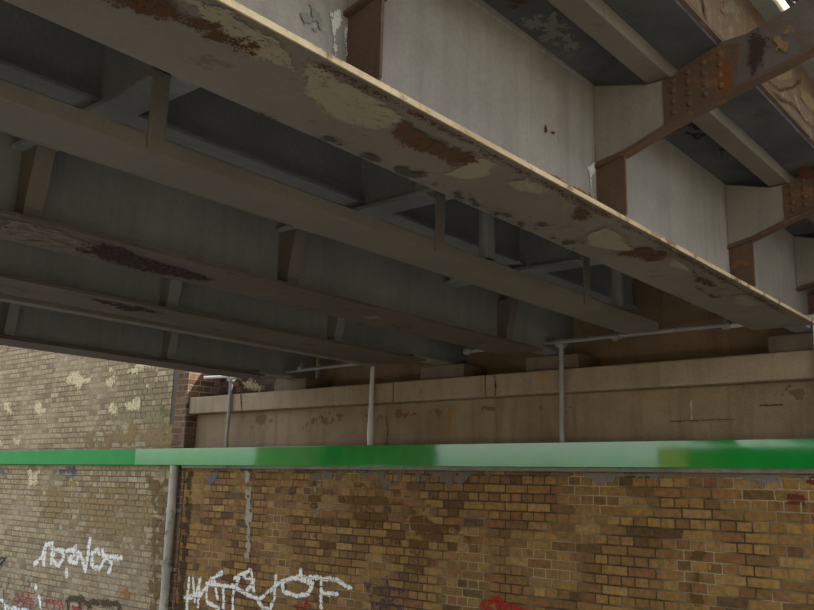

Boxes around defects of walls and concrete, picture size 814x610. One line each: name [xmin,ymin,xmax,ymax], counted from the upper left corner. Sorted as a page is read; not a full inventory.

corrosion [103,0,261,57]
corrosion [307,59,784,312]
corrosion [75,242,214,282]
flaking render [66,370,92,390]
flaking render [125,364,159,375]
flaking render [108,397,141,416]
damp [244,470,253,559]